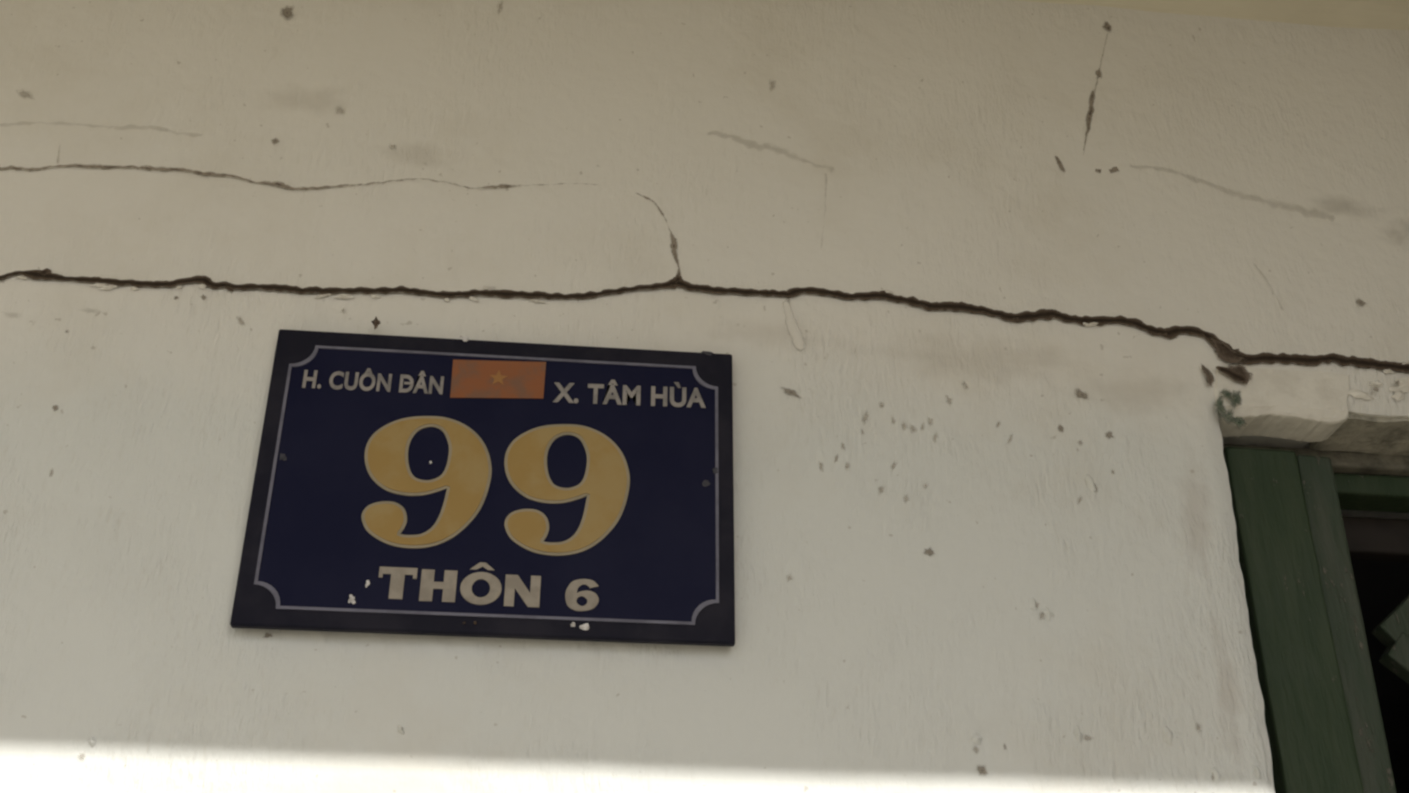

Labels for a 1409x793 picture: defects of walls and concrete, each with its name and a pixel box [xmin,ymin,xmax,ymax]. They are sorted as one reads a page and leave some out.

crack [1055,70,1119,173]
crack [0,164,521,190]
crack [0,194,1409,374]